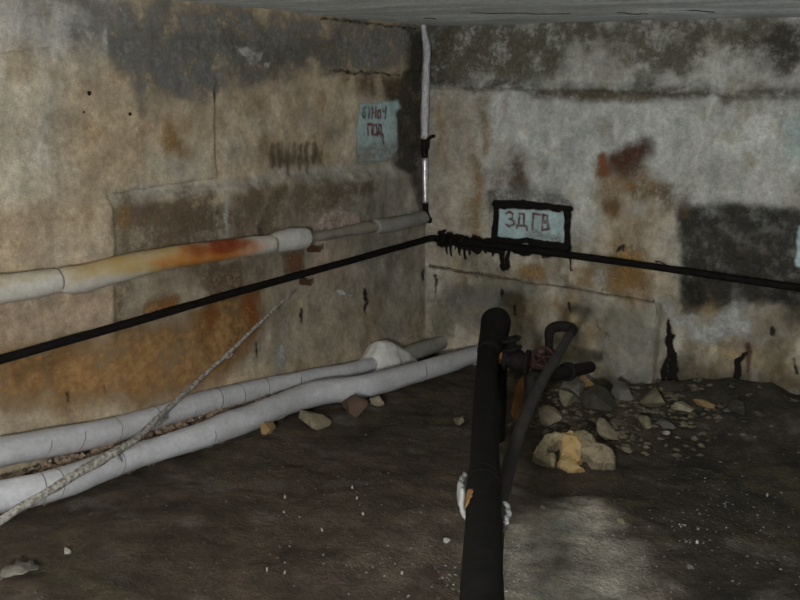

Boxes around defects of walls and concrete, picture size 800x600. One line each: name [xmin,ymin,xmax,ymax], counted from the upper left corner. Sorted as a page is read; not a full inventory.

leakage [72,0,800,209]
rust [597,139,666,196]
rust [0,266,259,407]
leakage [663,199,800,372]